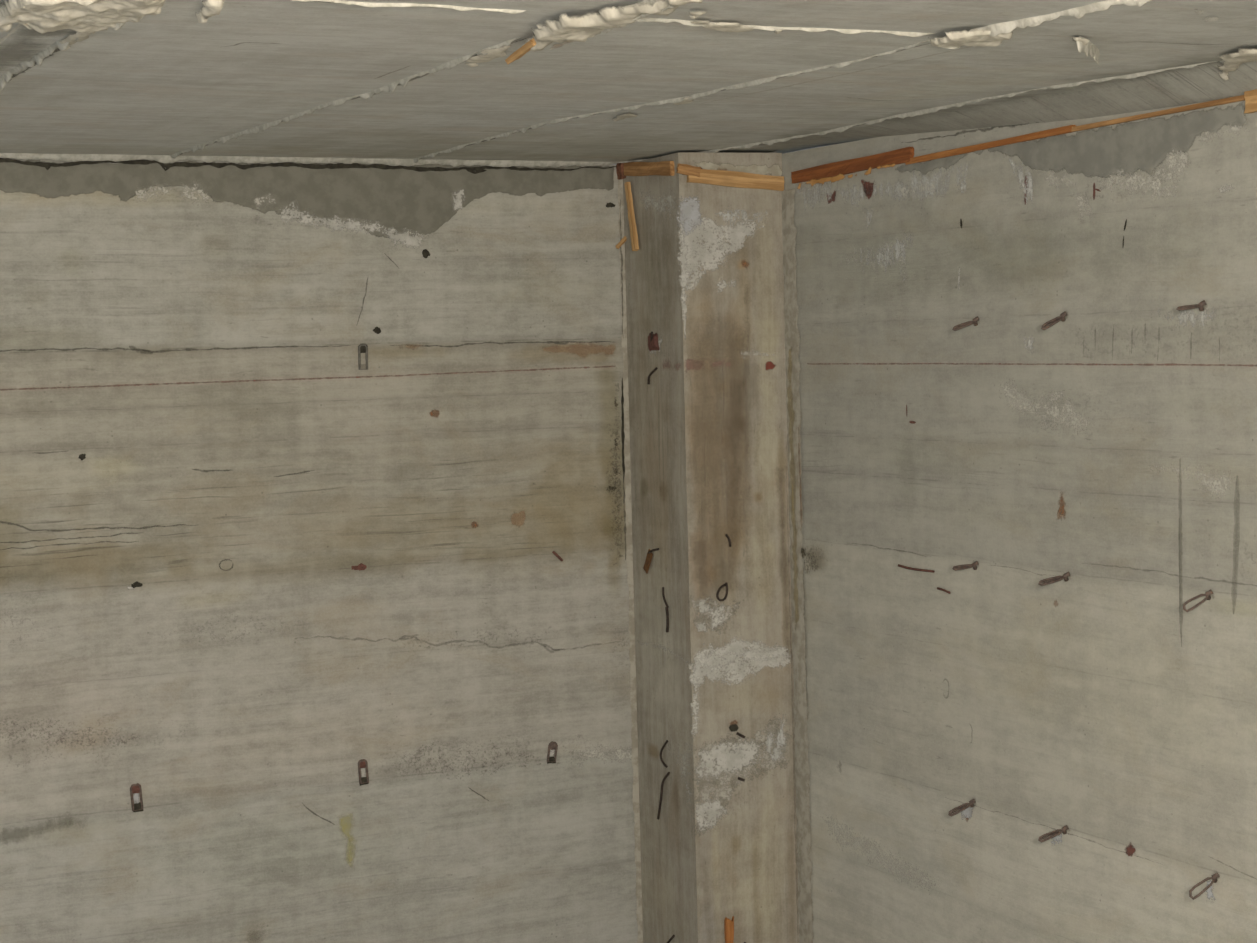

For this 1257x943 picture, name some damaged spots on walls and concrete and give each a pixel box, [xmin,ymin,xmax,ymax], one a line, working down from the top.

spalling [0,0,165,51]
spalling [525,0,754,52]
peeling [254,194,430,258]
peeling [452,190,465,210]
spalling [691,597,740,635]
spalling [695,717,790,835]